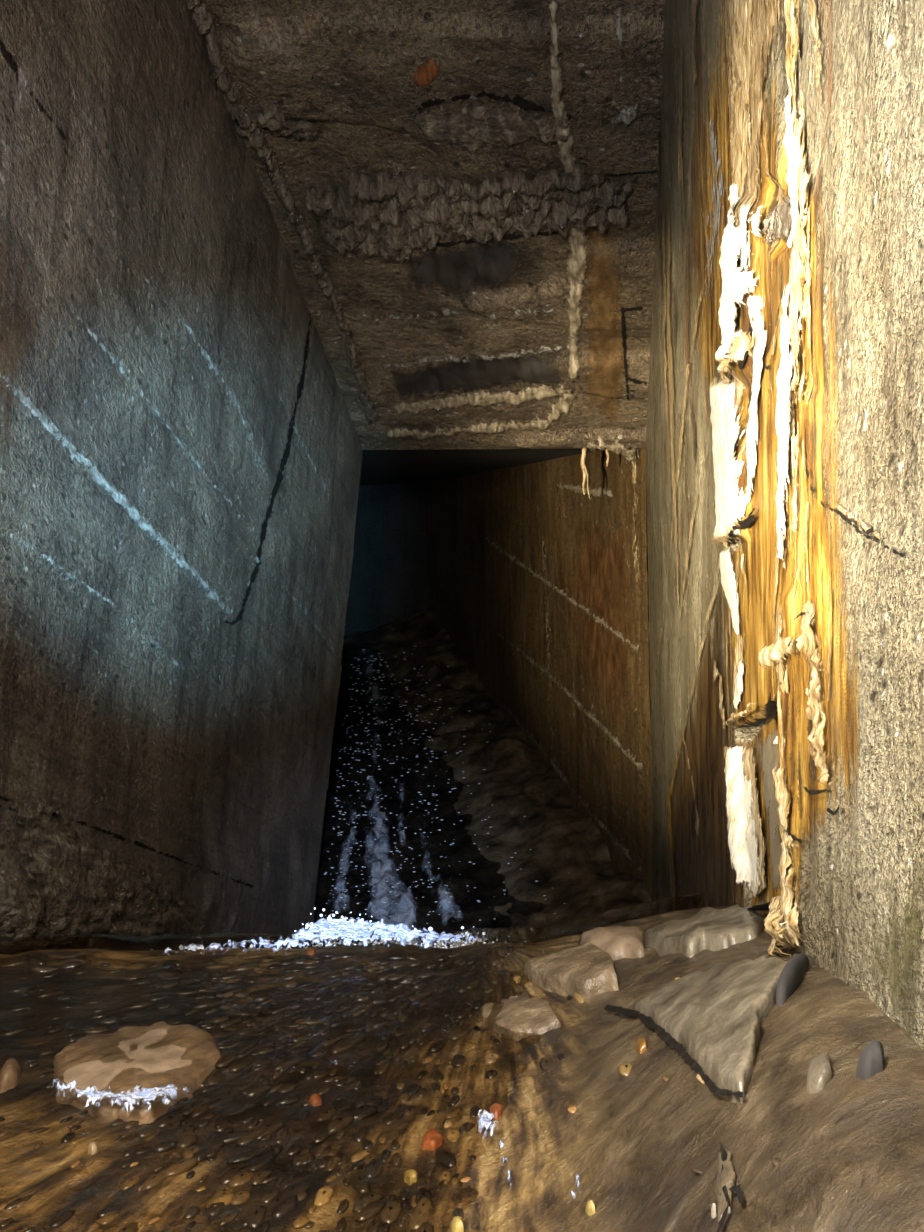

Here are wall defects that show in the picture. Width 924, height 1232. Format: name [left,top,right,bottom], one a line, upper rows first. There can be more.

crack [0,41,65,140]
spalling [762,195,792,243]
damp [407,242,541,299]
damp [393,355,559,396]
crack [225,313,312,626]
spalling [710,318,756,709]
crack [806,469,907,558]
spalling [723,729,786,897]